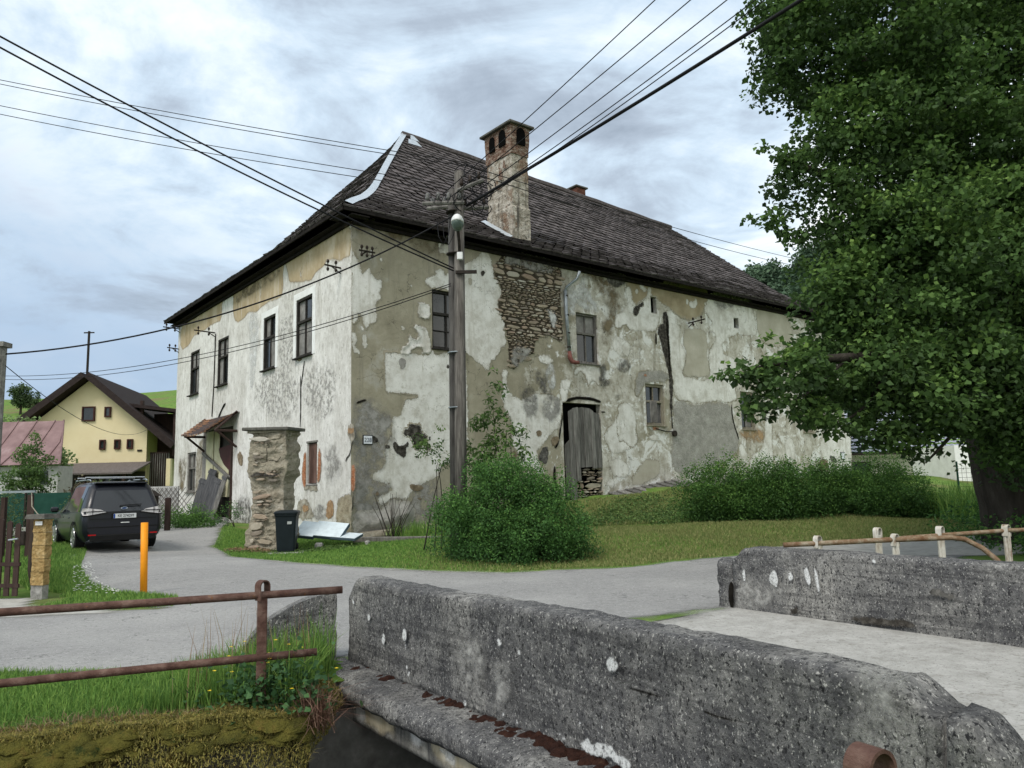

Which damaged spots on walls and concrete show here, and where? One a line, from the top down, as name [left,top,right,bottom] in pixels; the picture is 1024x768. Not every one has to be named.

peeling [180,227,384,354]
flaking render [297,450,356,532]
flaking render [372,301,450,506]
flaking render [425,268,449,290]
flaking render [465,252,601,473]
flaking render [604,374,660,488]
flaking render [607,271,793,405]